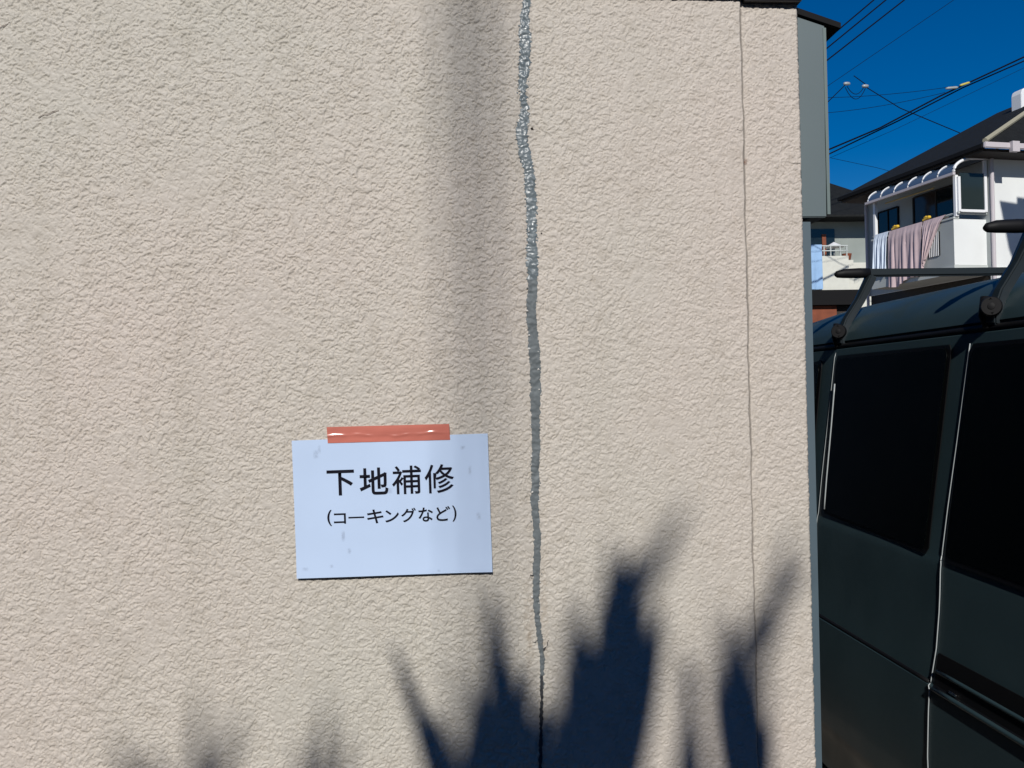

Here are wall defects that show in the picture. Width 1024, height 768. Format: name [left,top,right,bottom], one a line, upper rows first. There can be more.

crack [515,0,549,768]